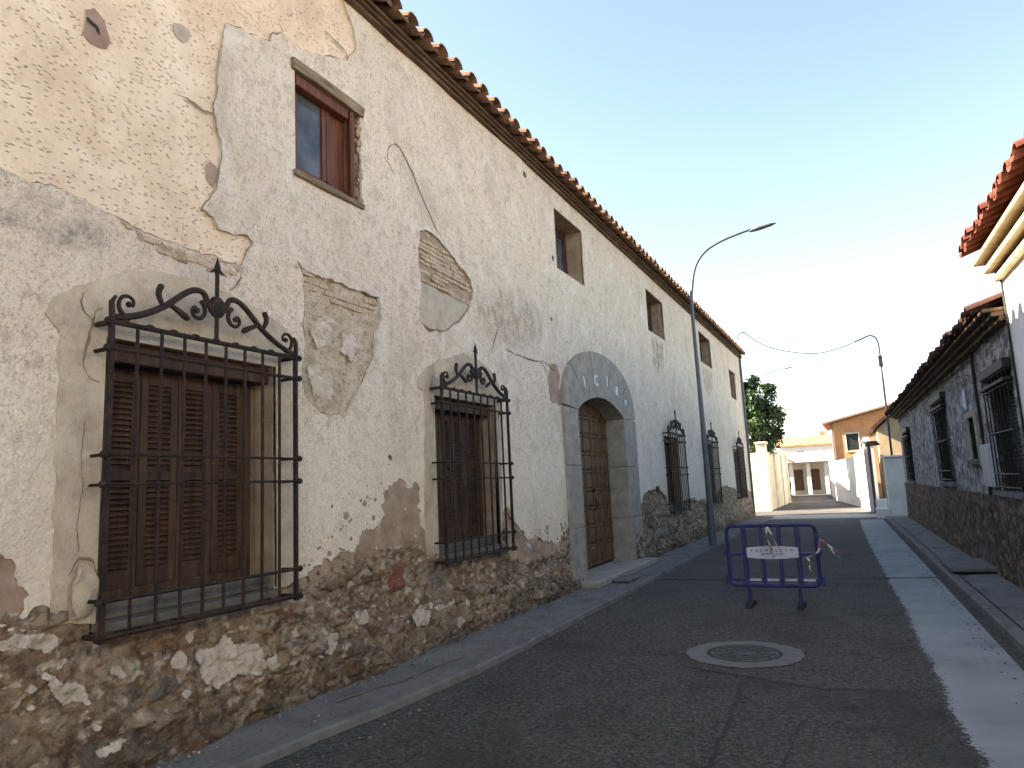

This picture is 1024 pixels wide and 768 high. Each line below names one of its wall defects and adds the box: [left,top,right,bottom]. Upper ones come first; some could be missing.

flaking render [0,0,356,291]
crack [386,142,442,240]
flaking render [418,230,473,333]
flaking render [298,263,380,417]
peeling [306,479,437,593]
peeling [502,510,571,566]
peeling [0,554,29,624]
peeling [26,685,38,711]
peeling [170,632,194,669]
peeling [267,653,278,670]